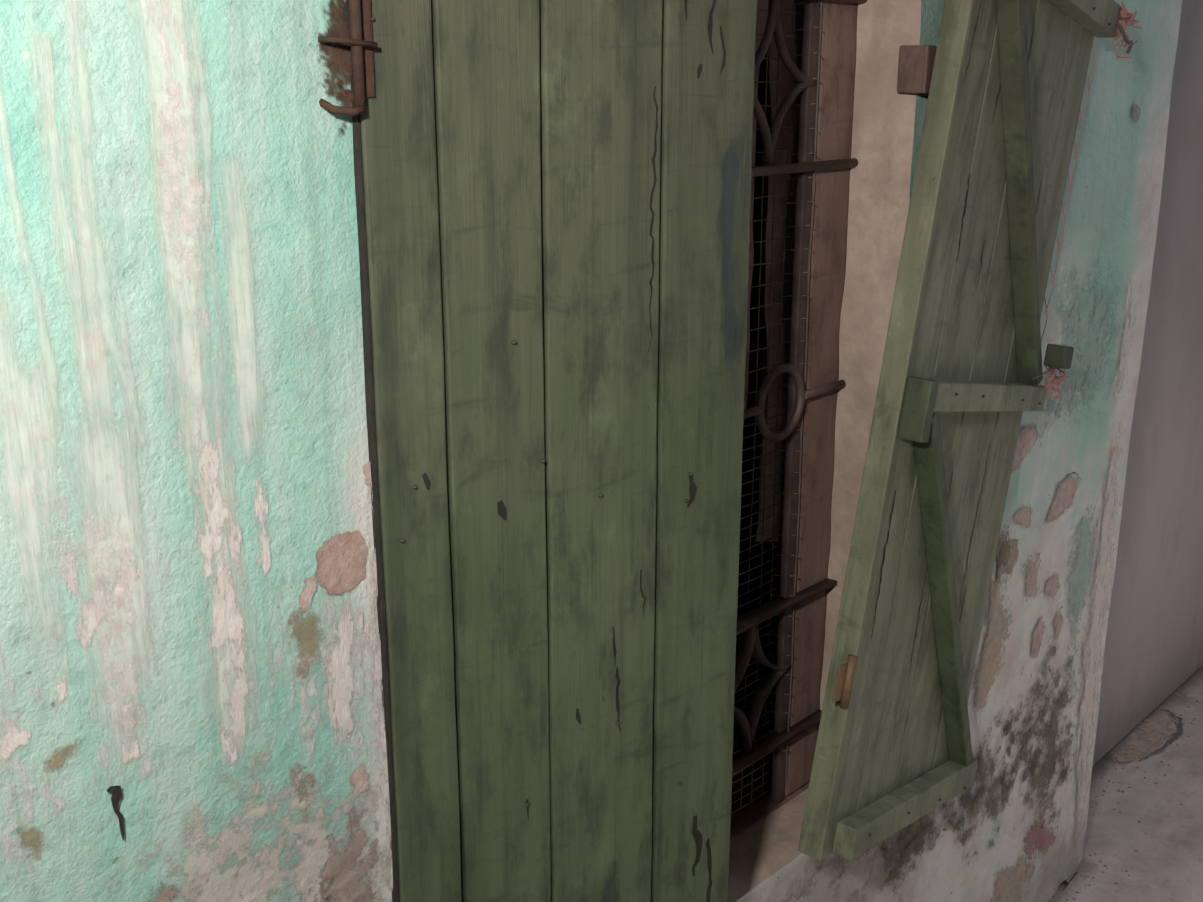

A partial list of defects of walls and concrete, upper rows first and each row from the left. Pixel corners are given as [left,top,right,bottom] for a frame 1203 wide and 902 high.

rust [319,0,353,133]
peeling [0,713,64,862]
peeling [54,506,155,777]
spalling [97,746,124,840]
flaking render [142,424,393,902]
water stain [881,646,1080,891]
peeling [972,428,1122,853]